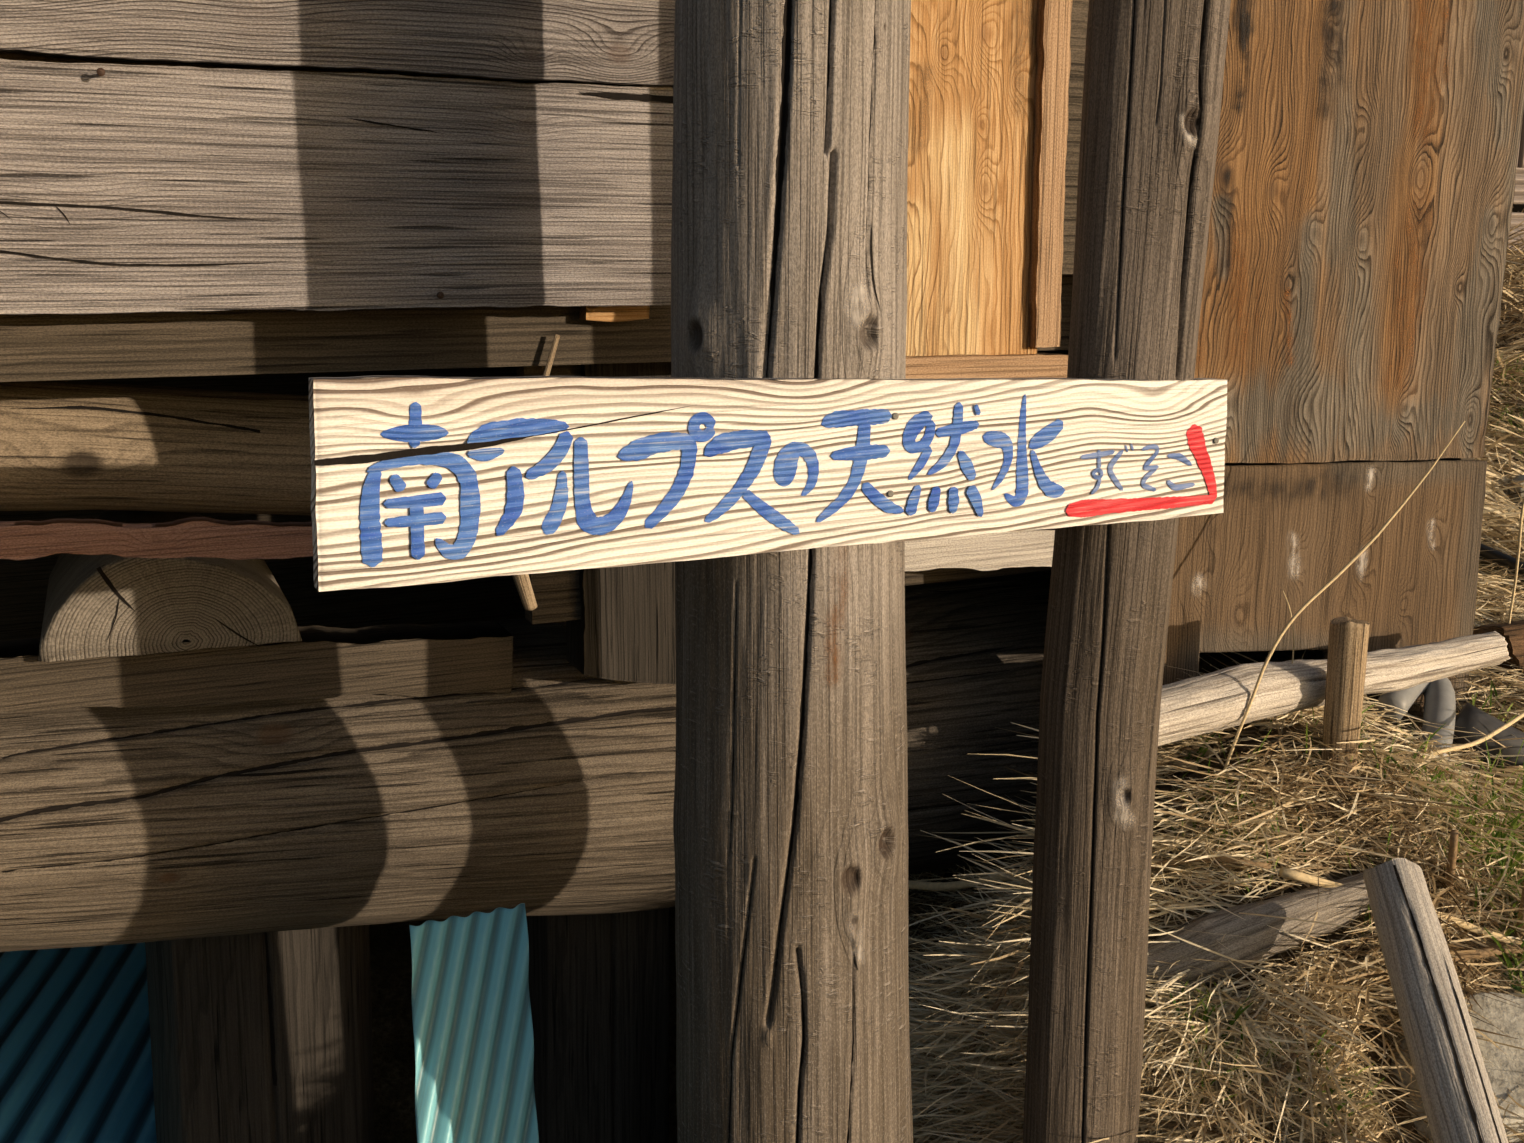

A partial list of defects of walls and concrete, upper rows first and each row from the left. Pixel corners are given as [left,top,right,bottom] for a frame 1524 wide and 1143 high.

crack [766,0,792,378]
crack [815,0,831,378]
crack [865,0,882,317]
crack [1,772,628,873]
crack [0,679,676,822]
crack [728,549,812,1143]